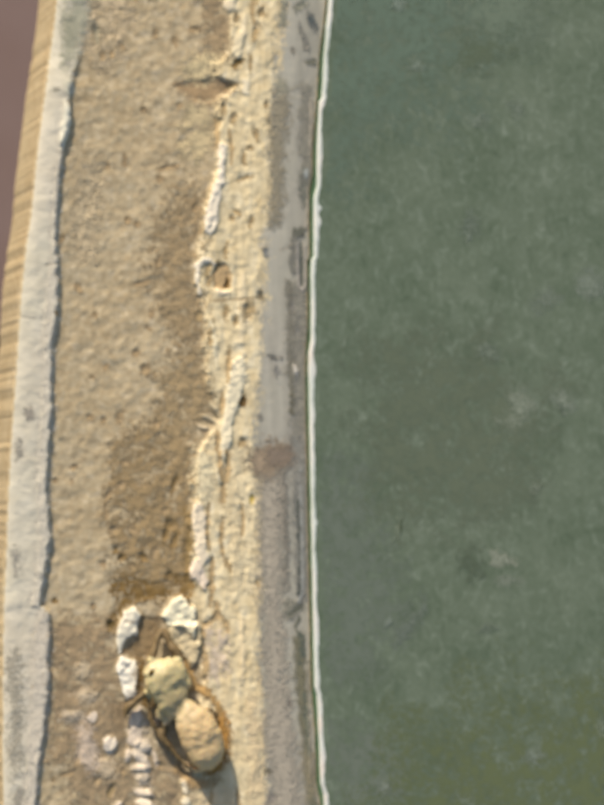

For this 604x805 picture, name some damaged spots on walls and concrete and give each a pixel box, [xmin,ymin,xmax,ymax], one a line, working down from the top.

peeling [156,0,267,235]
peeling [21,76,168,805]
peeling [167,240,268,611]
peeling [162,595,233,686]